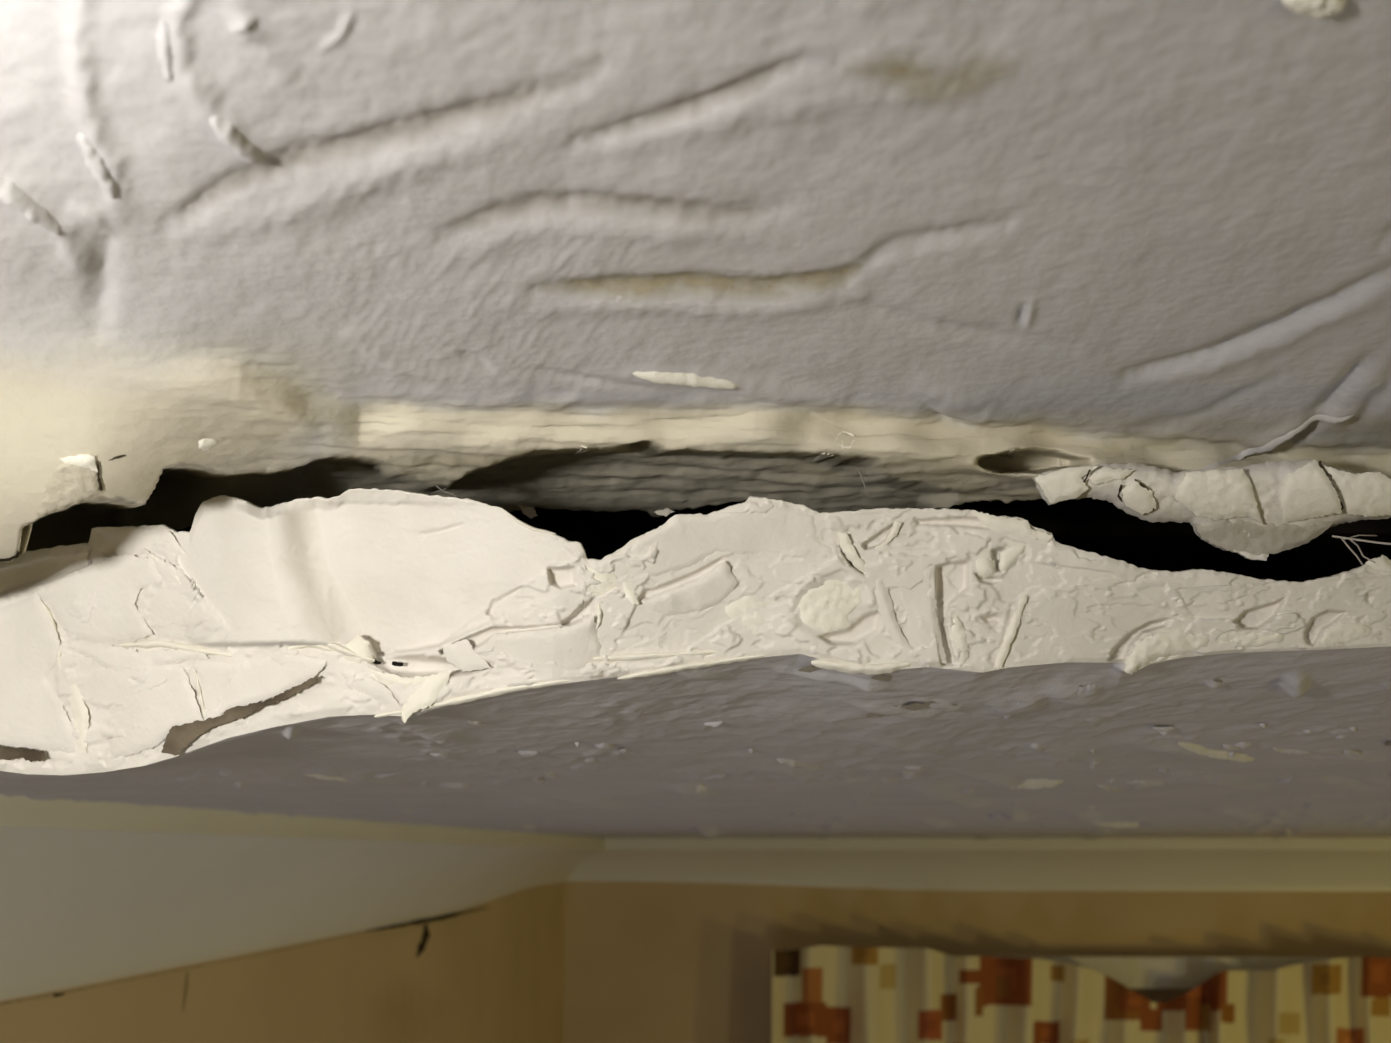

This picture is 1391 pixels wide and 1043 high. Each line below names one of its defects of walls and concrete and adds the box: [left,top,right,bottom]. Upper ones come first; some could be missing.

spalling [36,454,126,518]
spalling [0,488,1391,775]